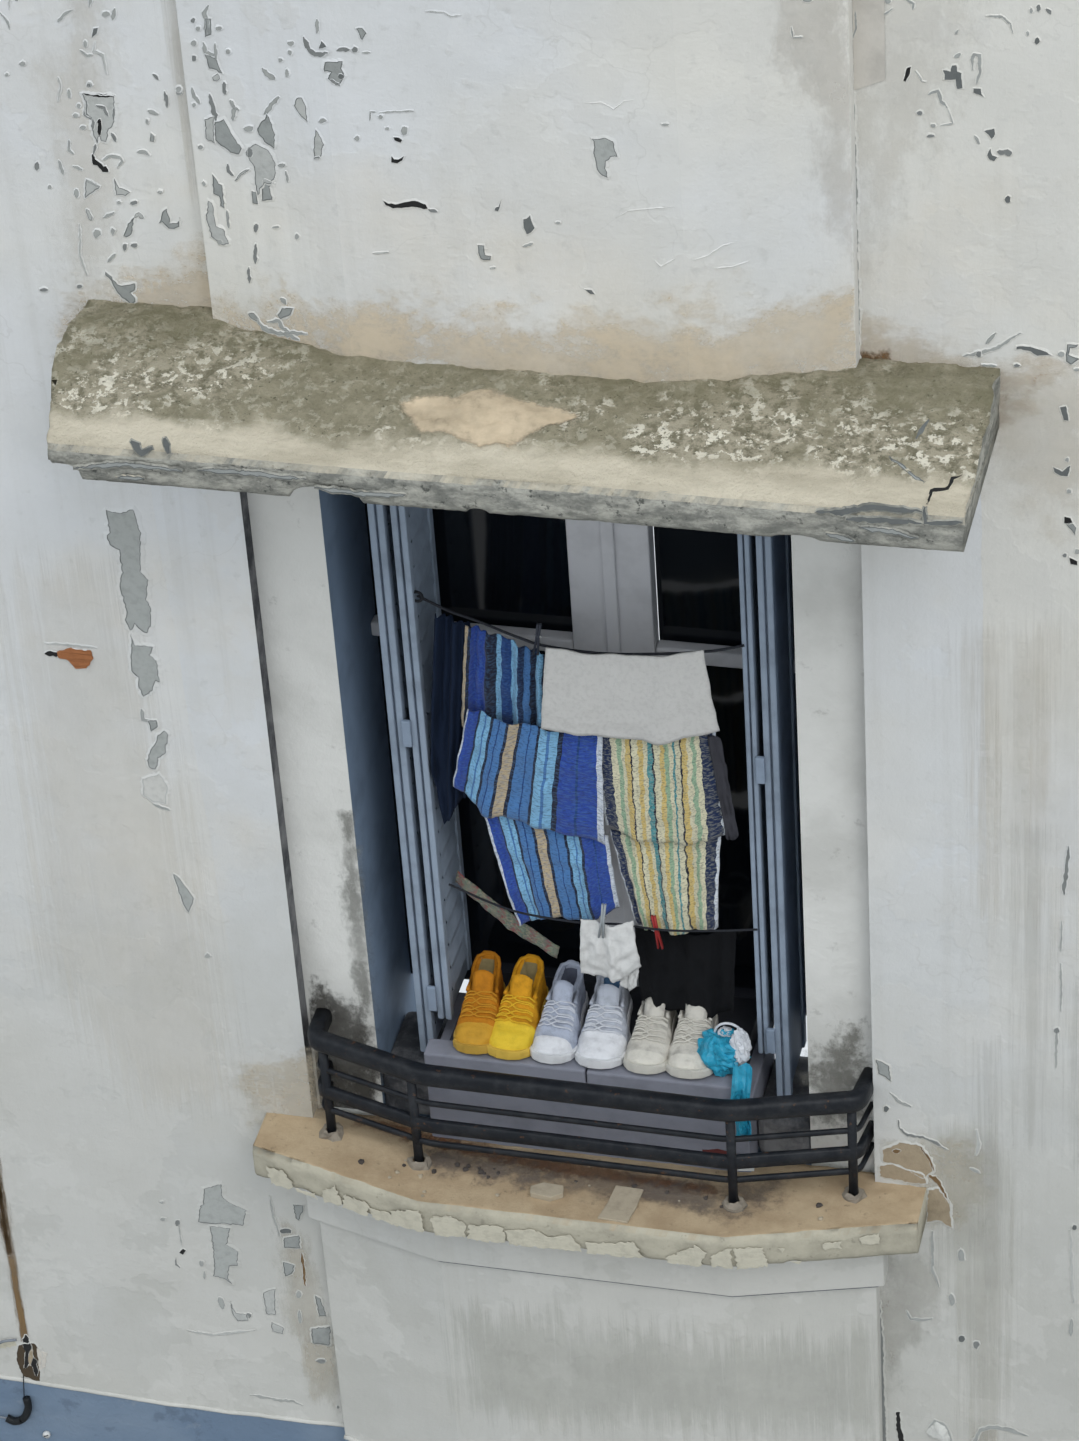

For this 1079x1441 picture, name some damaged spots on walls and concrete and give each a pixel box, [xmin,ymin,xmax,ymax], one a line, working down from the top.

peeling [941,28,986,98]
peeling [33,0,371,304]
peeling [590,135,621,180]
peeling [973,127,1013,162]
crack [961,331,1079,372]
peeling [402,389,576,447]
crack [887,419,965,505]
corrosion [44,641,97,669]
peeling [101,505,172,811]
corrosion [357,1120,714,1193]
flaking render [876,1139,954,1229]
peeling [159,1166,643,1364]